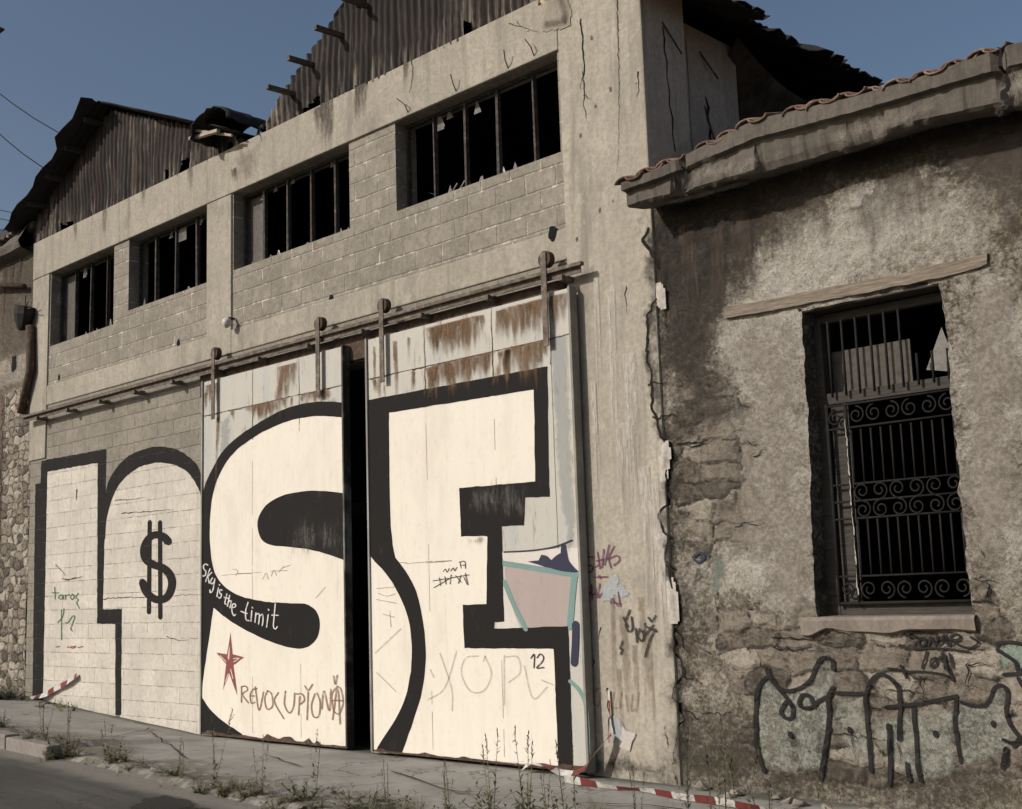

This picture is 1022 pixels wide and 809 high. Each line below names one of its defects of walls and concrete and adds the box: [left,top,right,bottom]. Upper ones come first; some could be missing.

crack [579,19,587,114]
crack [616,1,639,162]
crack [662,21,719,190]
rust [247,363,329,416]
rust [393,337,409,381]
rust [426,293,567,391]
flaking render [649,233,668,310]
water stain [658,202,776,421]
flaking render [651,524,667,557]
flaking render [658,439,671,491]
crack [624,227,763,764]
flaking render [664,577,679,624]